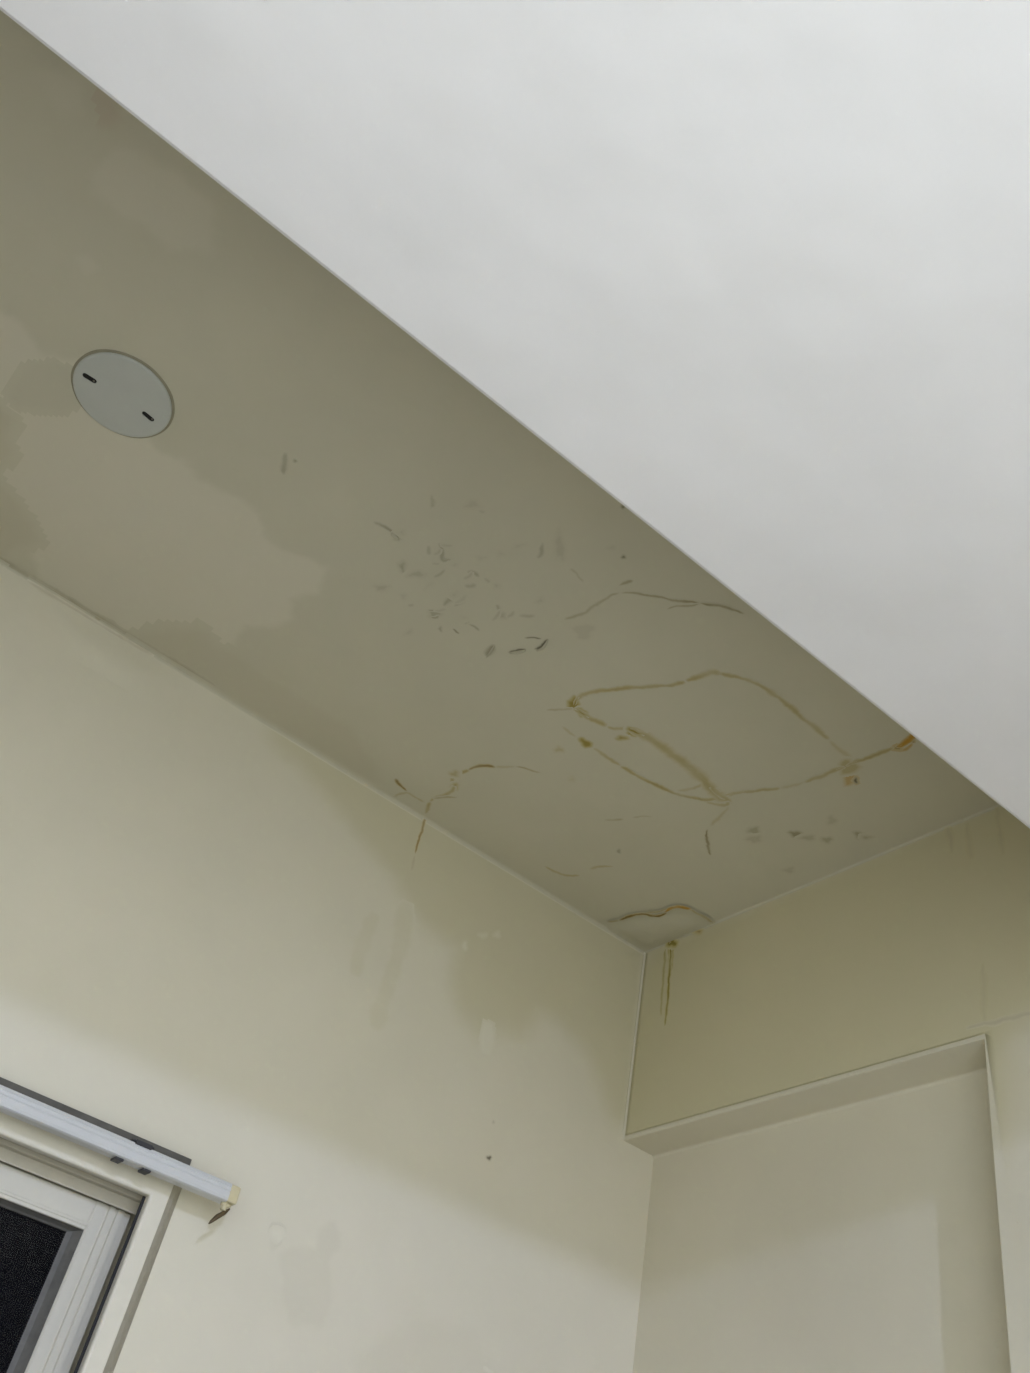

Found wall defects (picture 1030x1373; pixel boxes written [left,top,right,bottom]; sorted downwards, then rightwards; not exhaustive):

damp [24,56,233,266]
crack [563,567,745,644]
damp [0,297,1030,1188]
crack [392,667,917,872]
crack [607,904,718,926]